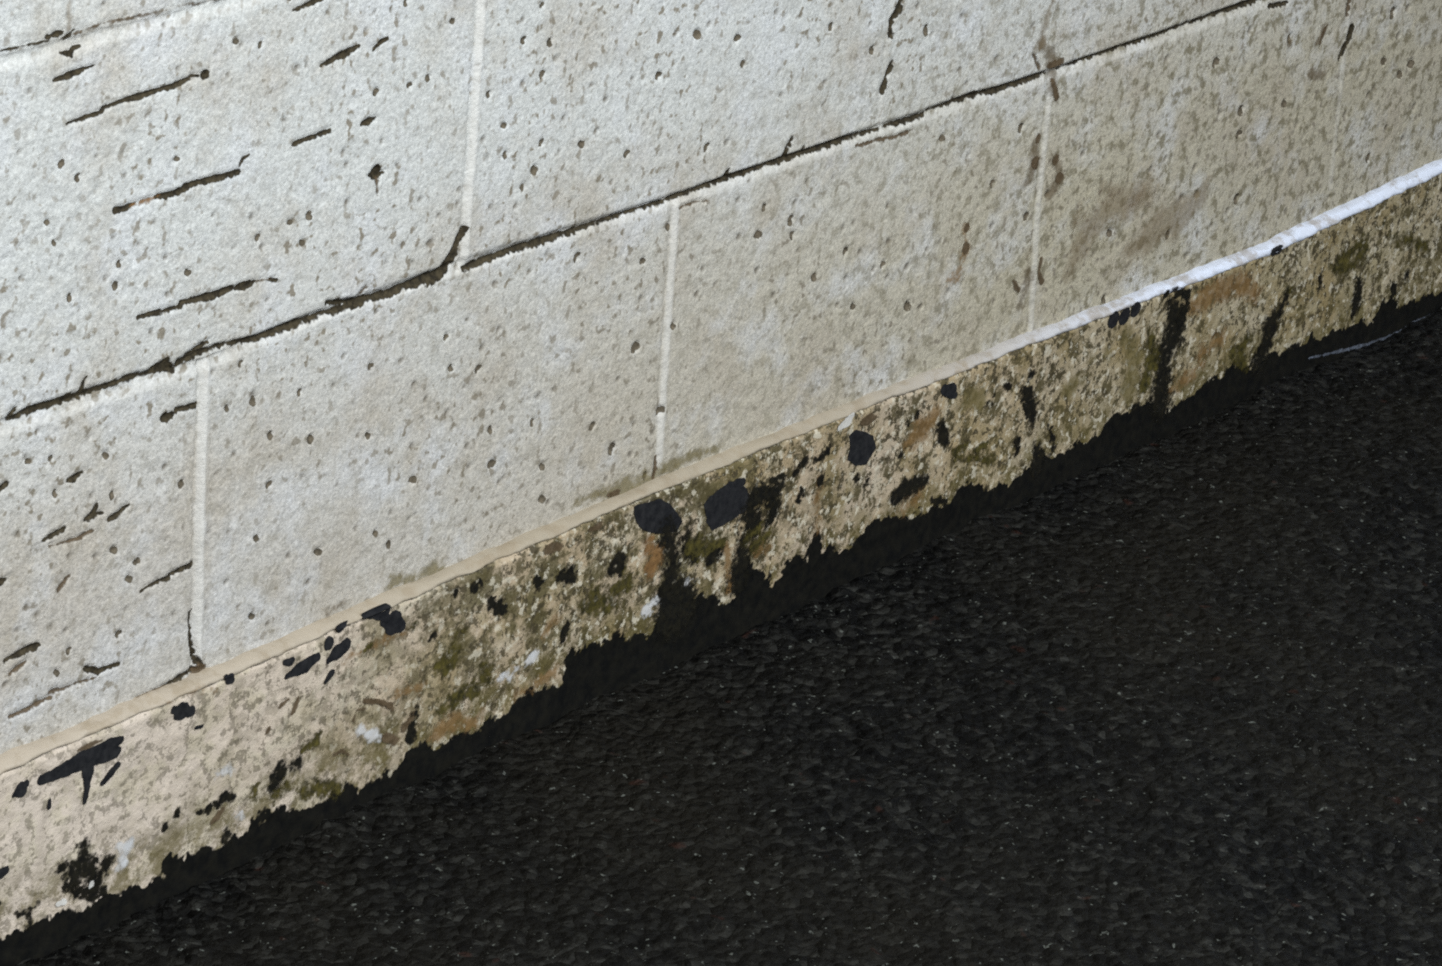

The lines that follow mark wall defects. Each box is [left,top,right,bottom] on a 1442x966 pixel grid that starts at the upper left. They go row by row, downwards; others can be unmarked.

crack [1338,0,1355,61]
crack [1,0,1288,420]
damp [1383,217,1432,257]
spalling [136,277,279,320]
peeling [838,412,877,466]
spalling [42,490,130,547]
peeling [634,498,702,644]
damp [0,233,1442,966]
peeling [283,603,406,684]
spalling [8,662,120,718]
peeling [171,702,204,730]
peeling [12,736,124,810]